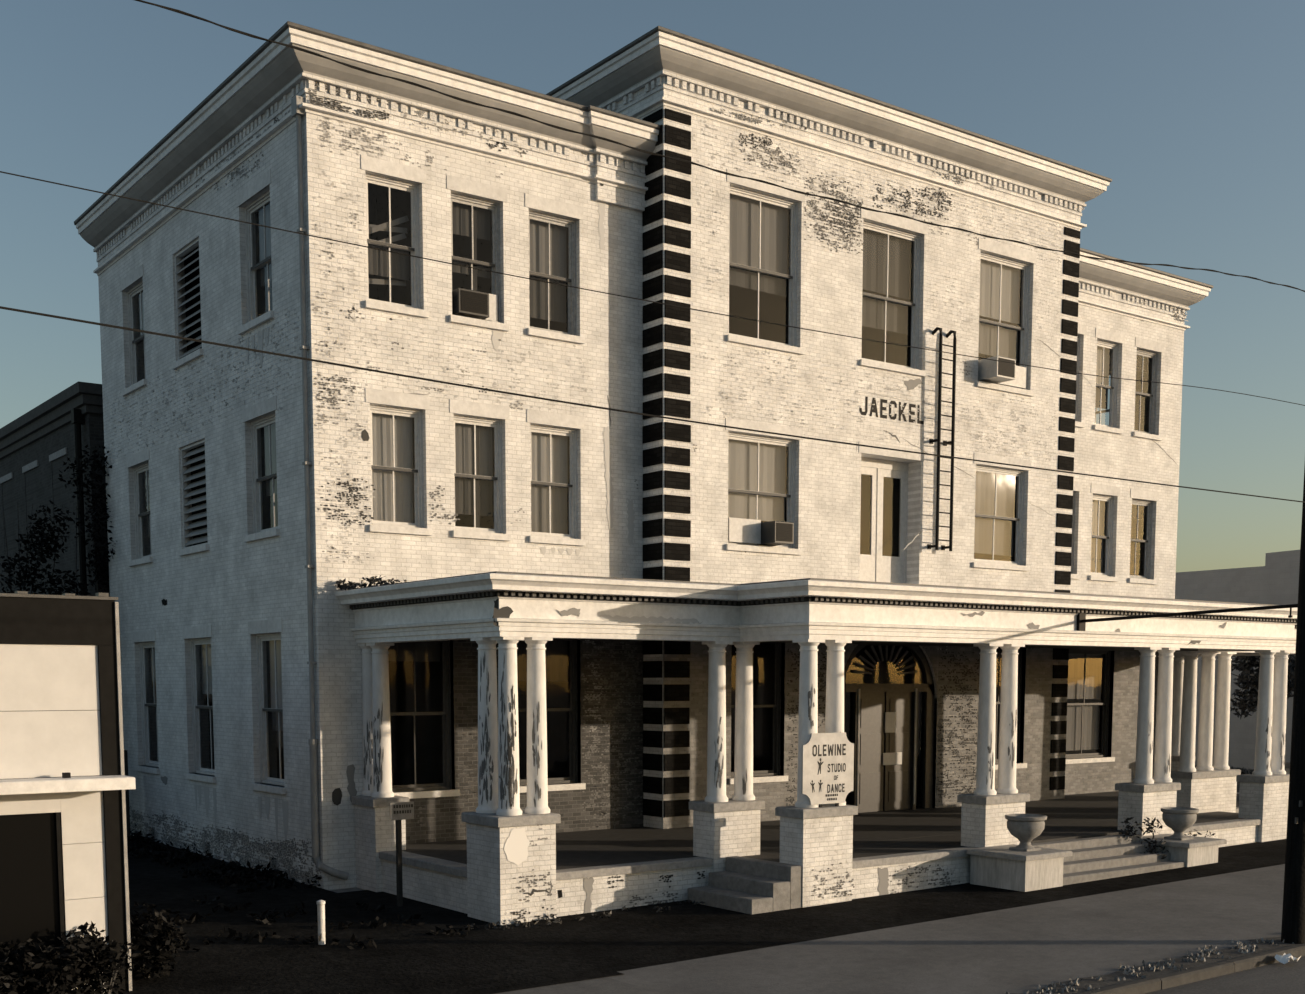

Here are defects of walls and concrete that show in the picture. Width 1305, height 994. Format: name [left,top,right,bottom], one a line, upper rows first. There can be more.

peeling [305,79,532,178]
spalling [108,171,593,563]
peeling [363,704,384,792]
peeling [532,702,542,807]